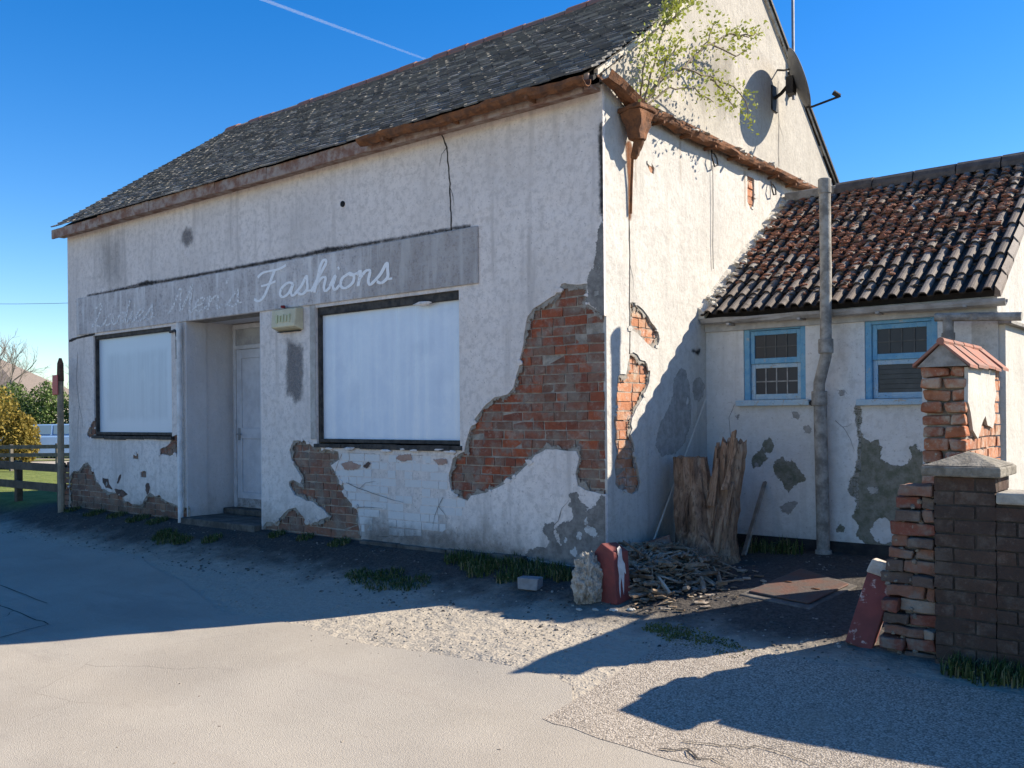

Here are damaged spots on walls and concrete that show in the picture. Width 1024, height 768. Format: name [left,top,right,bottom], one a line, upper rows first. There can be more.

crack [440,135,454,231]
flaking render [747,177,757,210]
leakage [87,226,470,296]
flaking render [627,302,660,349]
leakage [287,343,303,401]
flaking render [263,219,652,566]
flaking render [64,451,190,519]
flaking render [158,436,177,457]
peeling [752,437,806,514]
peeling [836,405,923,546]